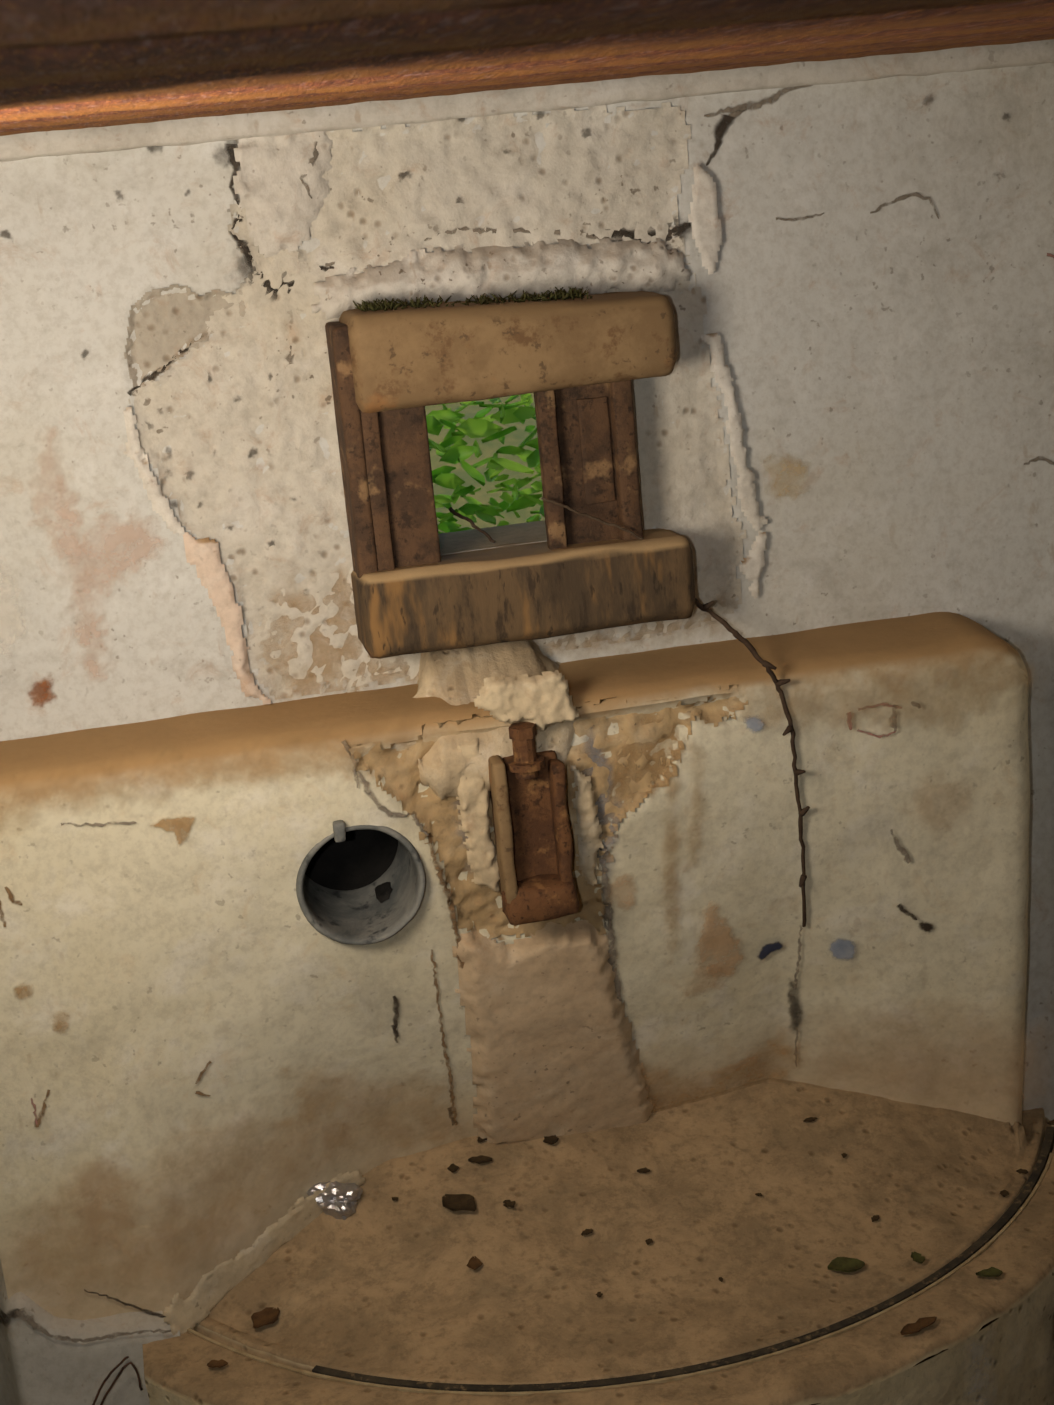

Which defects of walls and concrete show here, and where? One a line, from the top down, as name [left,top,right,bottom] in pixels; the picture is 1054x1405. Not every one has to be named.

crack [704,85,812,166]
crack [226,136,335,297]
crack [424,220,691,244]
flaking render [123,102,768,939]
crack [0,1289,171,1343]